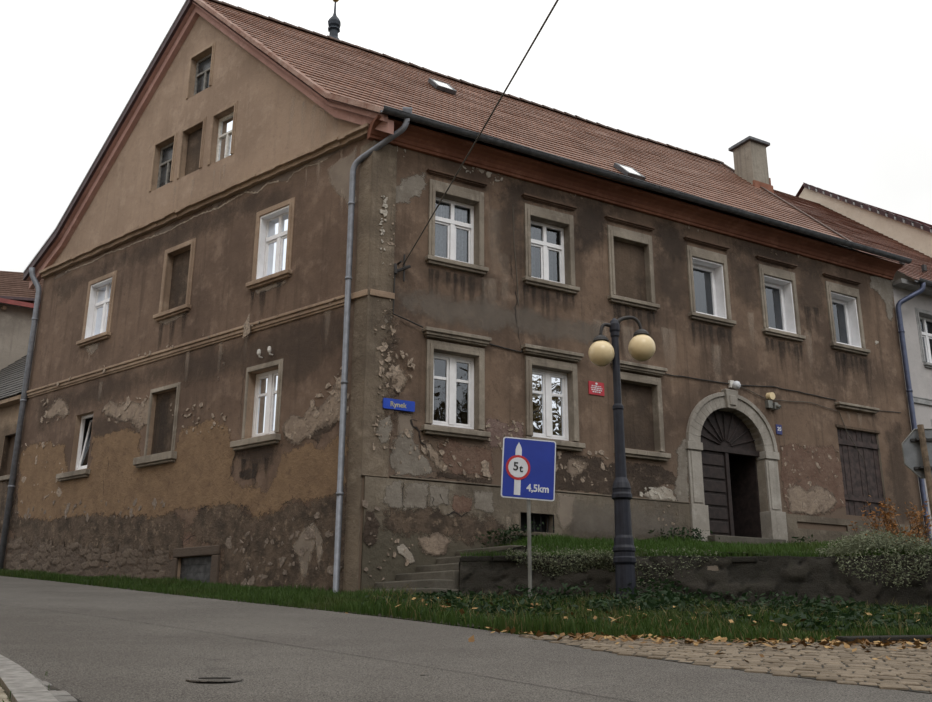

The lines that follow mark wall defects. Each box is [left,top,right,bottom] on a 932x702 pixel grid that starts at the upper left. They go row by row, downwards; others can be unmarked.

peeling [242,313,260,338]
flaking render [372,299,524,484]
flaking render [0,366,349,593]
flaking render [555,450,615,495]
flaking render [626,462,677,501]
flaking render [779,443,846,516]
flaking render [362,495,506,581]